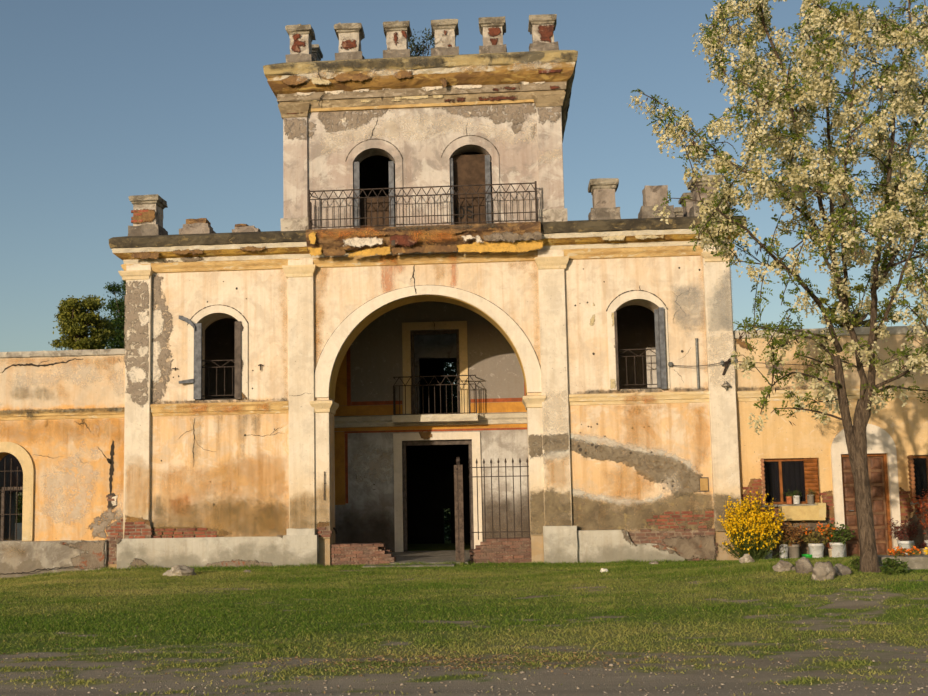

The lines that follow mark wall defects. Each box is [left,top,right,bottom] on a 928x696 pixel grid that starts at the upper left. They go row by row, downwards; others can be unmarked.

flaking render [291,34,306,53]
flaking render [340,39,357,50]
flaking render [488,26,501,45]
flaking render [538,24,555,43]
flaking render [281,67,562,140]
flaking render [308,228,544,257]
crack [0,358,83,373]
flaking render [124,275,179,407]
flaking render [528,423,703,498]
flaking render [60,495,231,569]
flaking render [622,509,718,561]
flaking render [899,487,928,553]